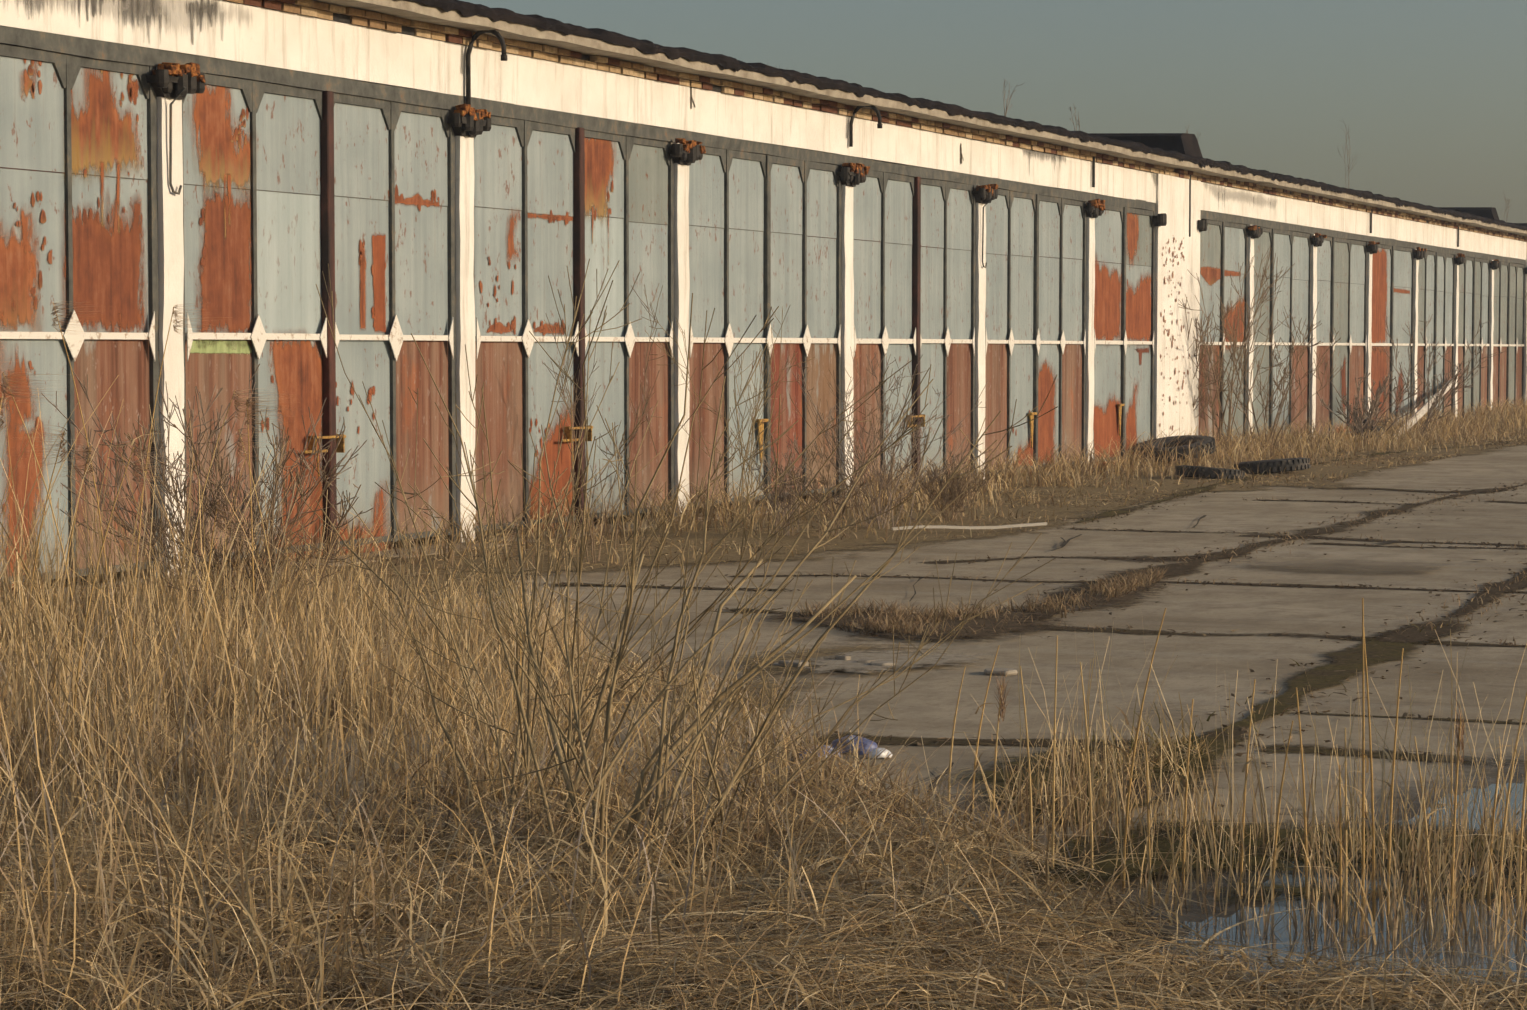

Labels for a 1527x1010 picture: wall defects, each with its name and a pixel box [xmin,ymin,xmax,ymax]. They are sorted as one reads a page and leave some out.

water stain [78,0,167,35]
water stain [186,0,217,44]
corrosion [0,68,145,333]
corrosion [193,84,252,333]
corrosion [359,235,386,332]
corrosion [480,137,614,336]
corrosion [1094,213,1151,365]
corrosion [1200,267,1241,285]
corrosion [1371,248,1410,426]
corrosion [0,351,45,586]
corrosion [1013,360,1055,473]
corrosion [1093,384,1138,466]